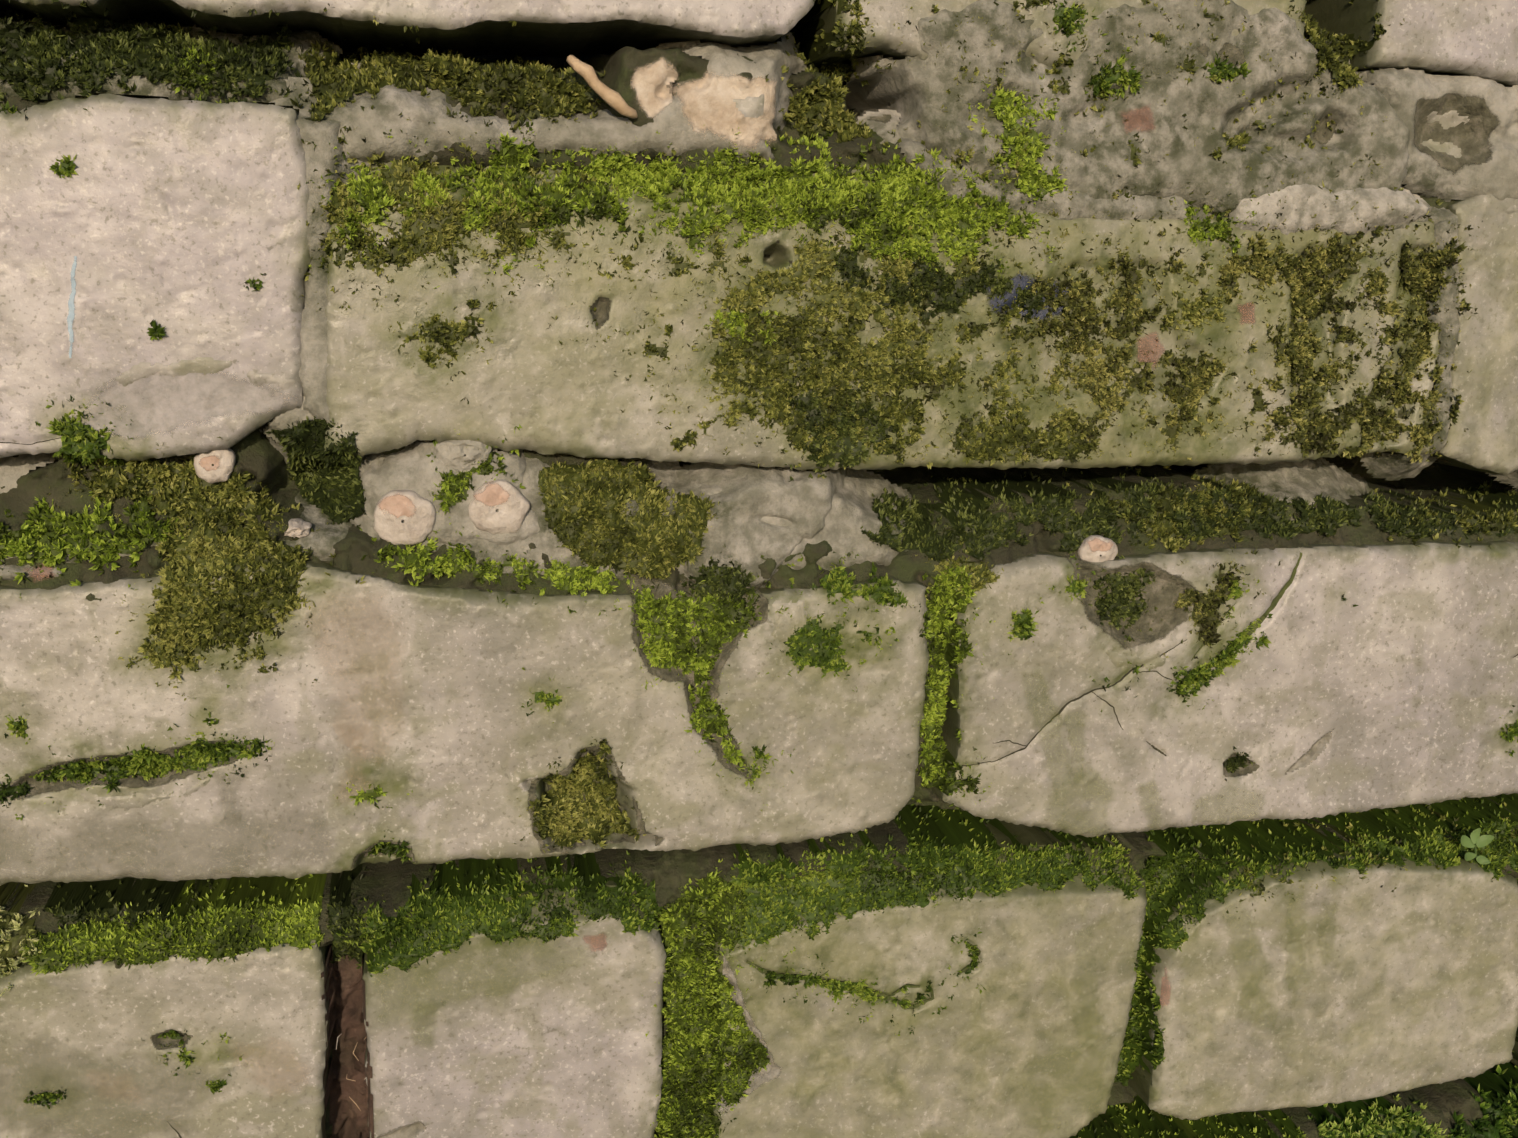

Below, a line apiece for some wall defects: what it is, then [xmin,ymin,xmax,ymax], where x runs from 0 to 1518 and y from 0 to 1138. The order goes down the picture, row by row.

crack [963,552,1302,766]